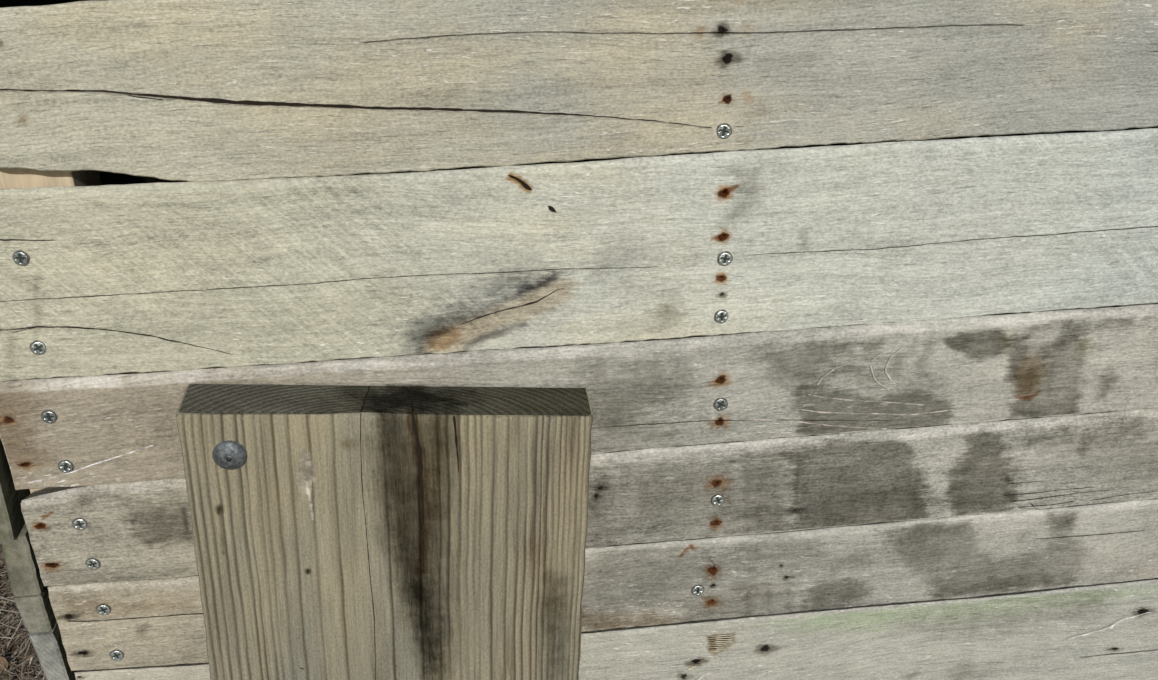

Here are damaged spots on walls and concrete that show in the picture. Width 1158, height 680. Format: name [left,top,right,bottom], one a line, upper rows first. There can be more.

crack [0,89,744,128]
crack [0,266,659,355]
damp [365,385,466,412]